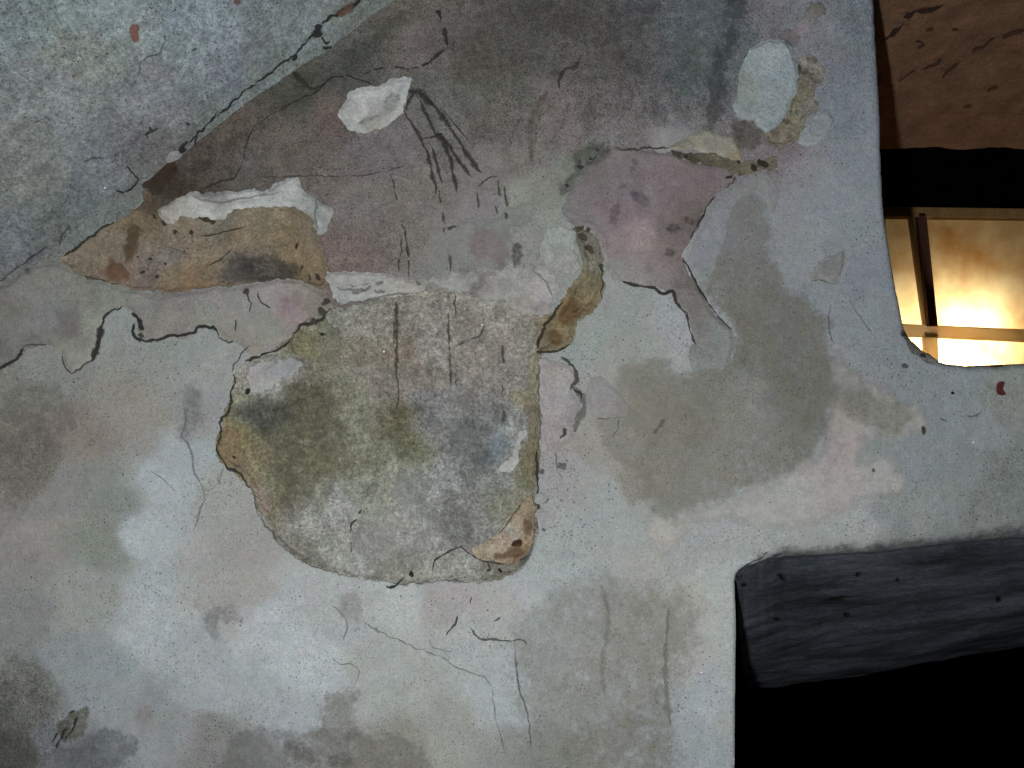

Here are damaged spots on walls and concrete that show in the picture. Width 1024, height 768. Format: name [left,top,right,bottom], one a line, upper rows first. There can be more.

crack [0,225,71,282]
crack [87,127,158,194]
crack [179,0,448,188]
flaking render [0,2,826,586]
damp [602,173,926,554]
crack [333,597,532,750]